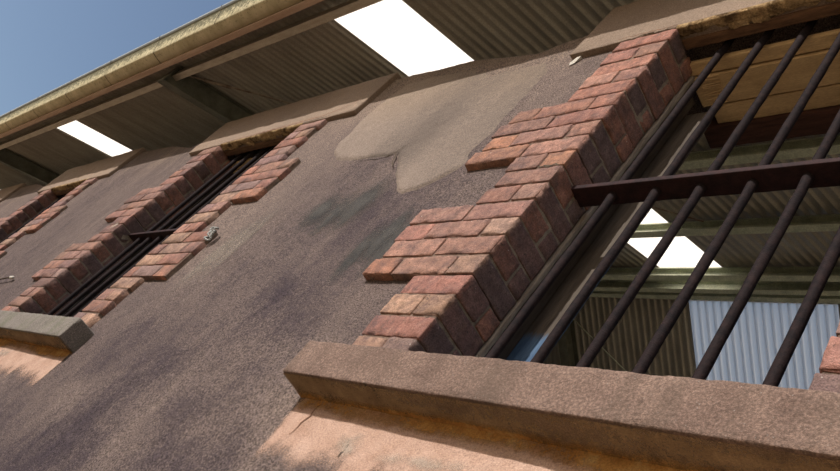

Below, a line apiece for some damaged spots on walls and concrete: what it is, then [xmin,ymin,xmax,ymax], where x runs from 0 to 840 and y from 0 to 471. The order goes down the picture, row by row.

flaking render [676,0,837,39]
flaking render [221,123,303,151]